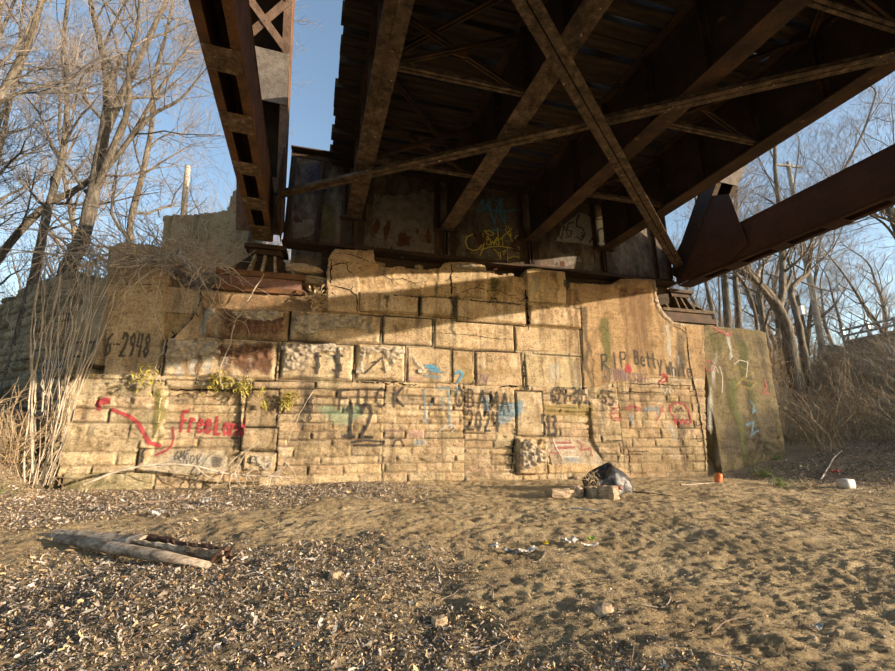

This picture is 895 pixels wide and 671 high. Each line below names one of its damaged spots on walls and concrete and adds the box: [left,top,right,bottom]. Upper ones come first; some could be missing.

crack [330,249,530,339]
spalling [654,282,684,326]
water stain [721,333,778,458]